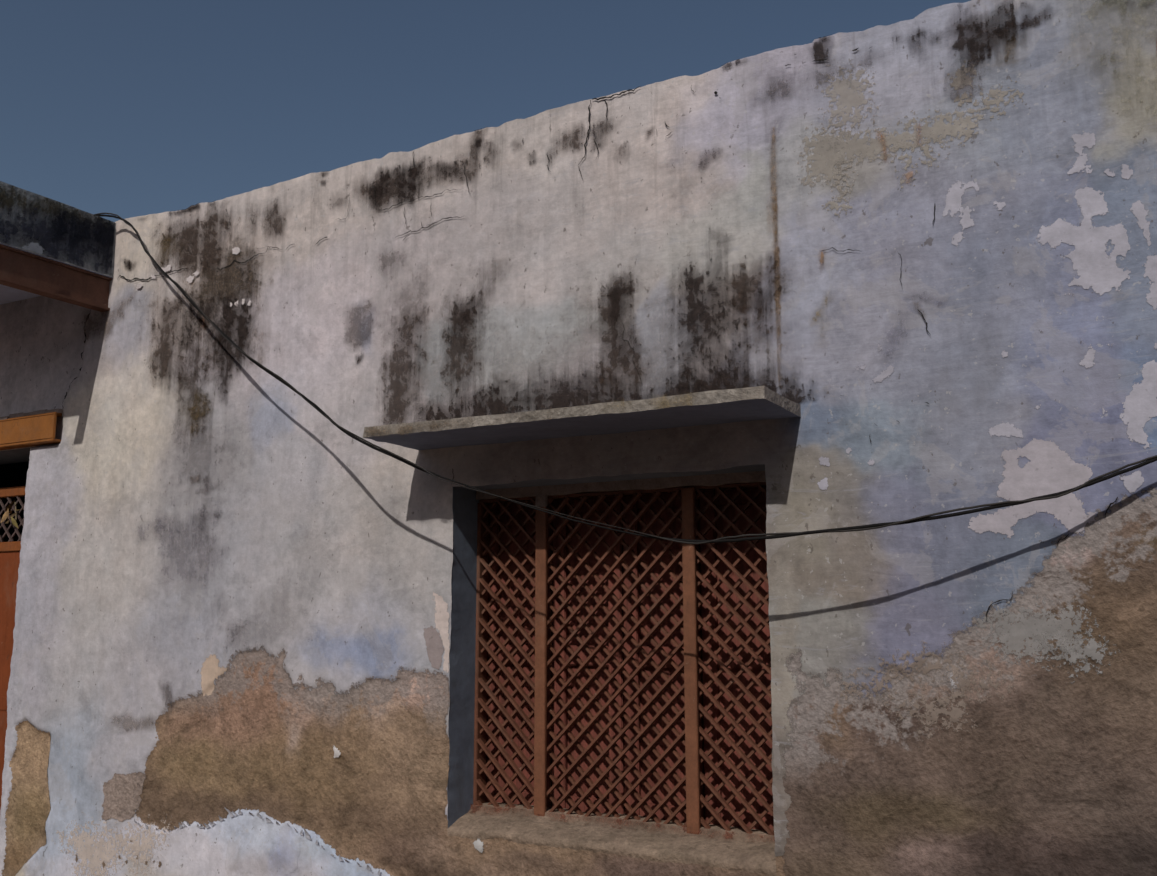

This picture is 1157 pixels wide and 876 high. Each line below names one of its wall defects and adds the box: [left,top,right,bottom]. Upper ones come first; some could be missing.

leakage [952,1,1051,70]
leakage [0,185,130,275]
leakage [251,199,285,235]
leakage [360,128,497,211]
crack [522,86,641,179]
peeling [942,180,979,246]
peeling [1037,132,1157,310]
leakage [150,204,261,434]
leakage [365,255,815,435]
peeling [1102,343,1157,449]
flaking render [2,421,1157,876]